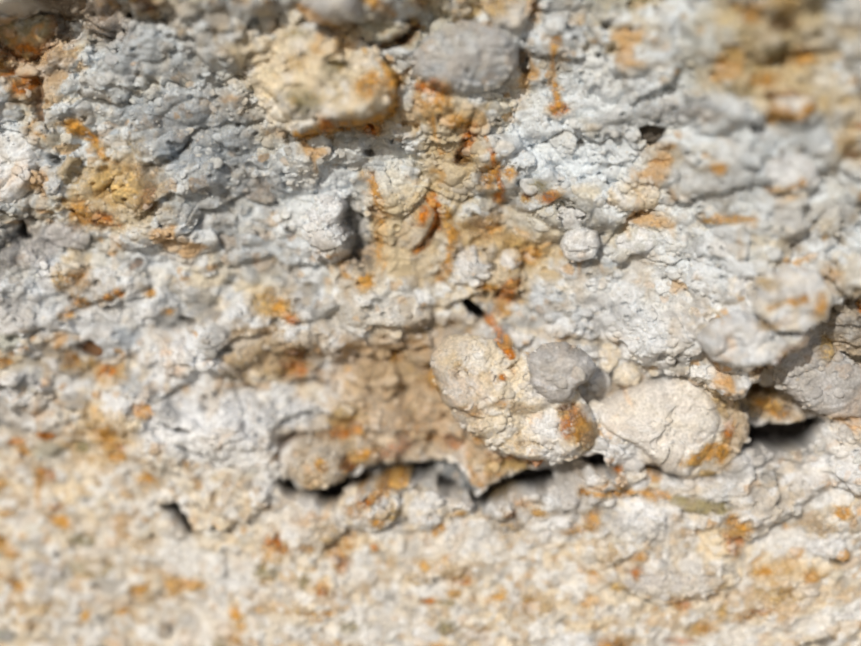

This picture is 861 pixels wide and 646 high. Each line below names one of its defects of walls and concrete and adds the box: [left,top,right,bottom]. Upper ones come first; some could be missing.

rust [287,91,316,112]
rust [292,60,403,140]
rust [414,79,518,204]
rust [548,82,569,116]
rust [368,175,385,257]
rust [412,190,543,281]
rust [232,287,299,335]
rust [356,273,375,293]
rust [479,277,521,360]
crack [282,458,553,503]